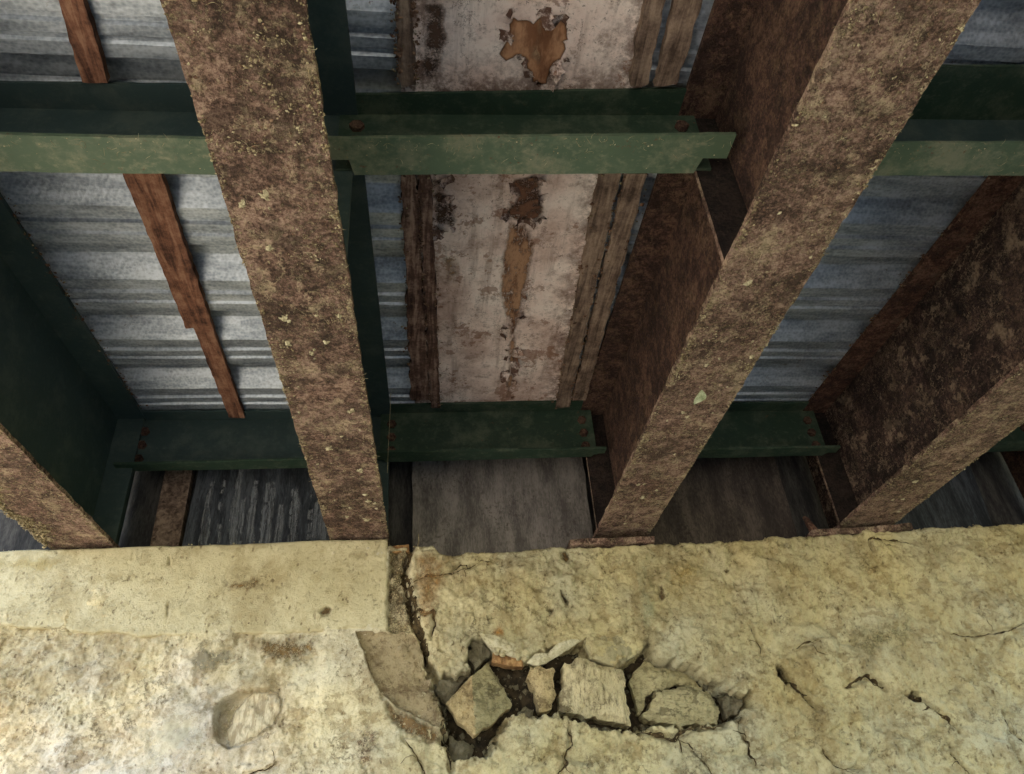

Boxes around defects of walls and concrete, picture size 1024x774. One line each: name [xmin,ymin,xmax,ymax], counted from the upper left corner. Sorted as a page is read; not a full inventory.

peeling [499,6,570,92]
peeling [500,175,550,398]
crack [400,552,496,667]
peeling [355,550,656,758]
crack [951,619,1022,637]
spalling [690,676,741,725]
crack [845,674,955,728]
crack [439,707,452,770]
crack [558,733,573,774]
crack [636,712,757,774]